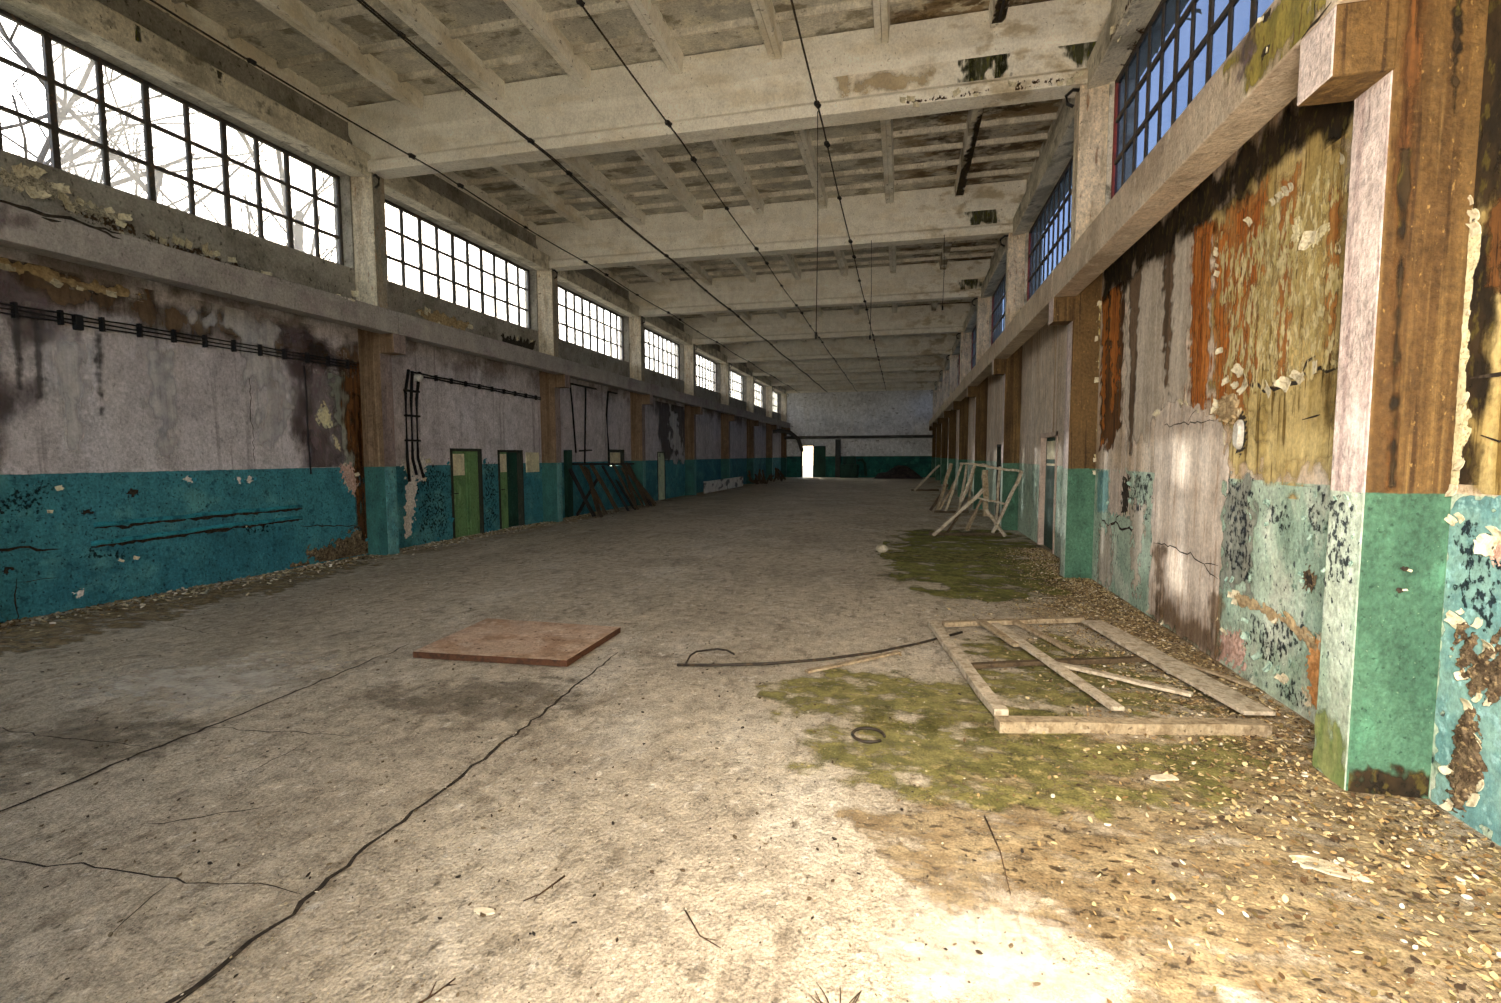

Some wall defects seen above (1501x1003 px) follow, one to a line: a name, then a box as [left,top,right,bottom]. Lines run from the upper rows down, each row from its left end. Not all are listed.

peeling [0,257,142,298]
peeling [0,162,272,276]
leakage [0,257,359,468]
spalling [1093,152,1356,717]
leakage [1387,259,1405,489]
leakage [1393,0,1422,238]
leakage [1451,0,1463,111]
peeling [1431,195,1501,846]
leakage [1459,0,1501,495]
crack [3,725,146,747]
crack [152,727,348,824]
crack [0,858,300,932]